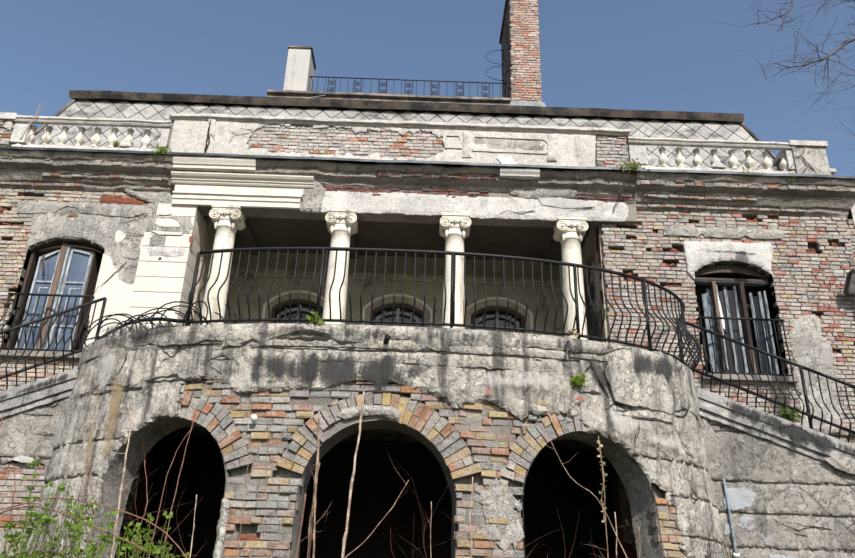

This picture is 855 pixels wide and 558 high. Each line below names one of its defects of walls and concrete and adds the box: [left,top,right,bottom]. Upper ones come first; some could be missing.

crack [204,120,256,153]
flaking render [247,125,448,160]
flaking render [59,207,78,217]
flaking render [100,189,154,205]
flaking render [110,211,194,269]
damp [251,351,439,387]
damp [485,373,549,394]
flaking render [0,455,45,533]